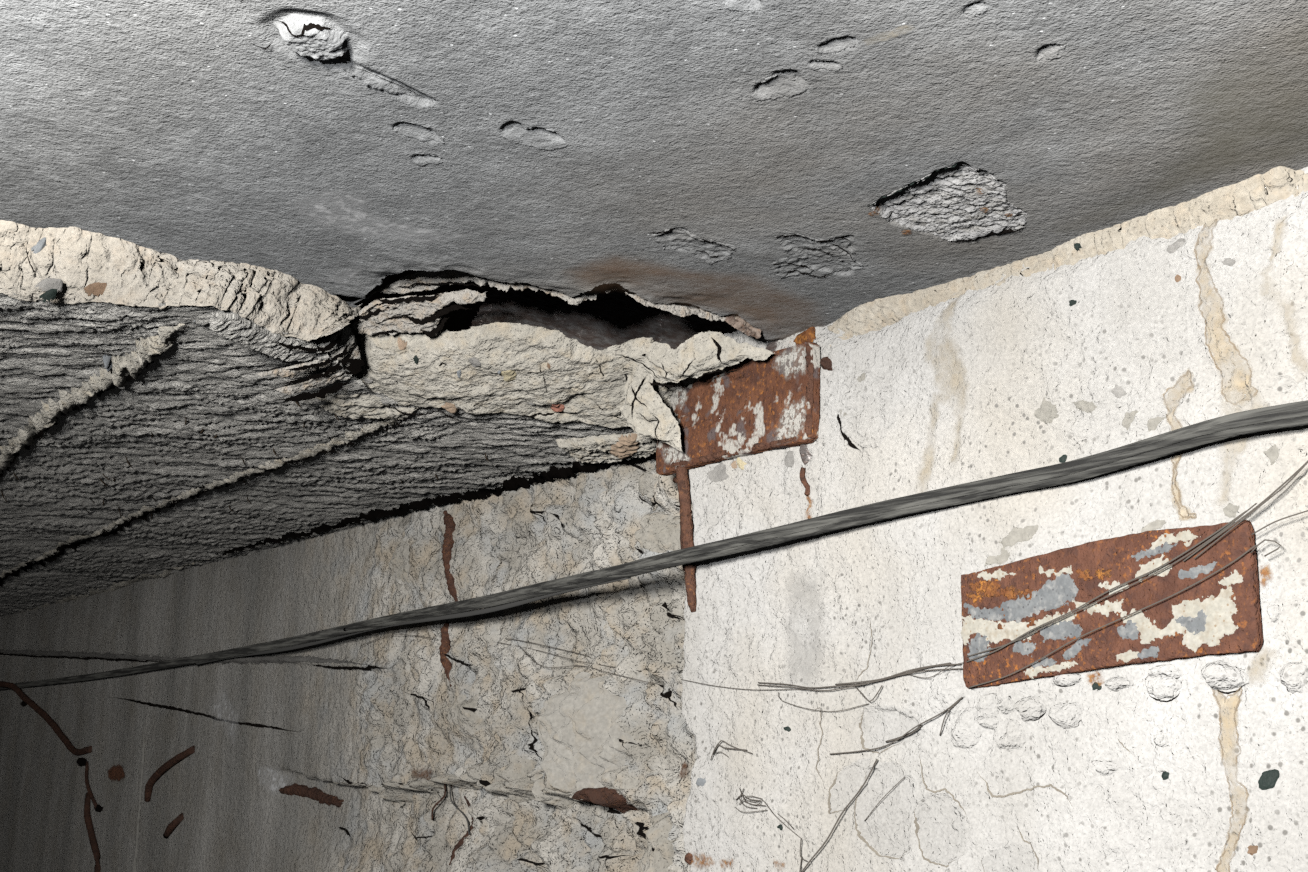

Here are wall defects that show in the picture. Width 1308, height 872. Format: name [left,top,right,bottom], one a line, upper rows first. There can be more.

spalling [864,161,1028,244]
spalling [0,220,655,429]
peeling [625,292,762,339]
water stain [1194,219,1258,395]
crack [216,337,736,556]
crack [0,409,419,588]
water stain [1170,451,1196,520]
rust [966,579,1033,630]
crack [114,697,303,731]
water stain [1212,687,1243,763]
rust [279,783,344,808]
rust [572,787,639,814]